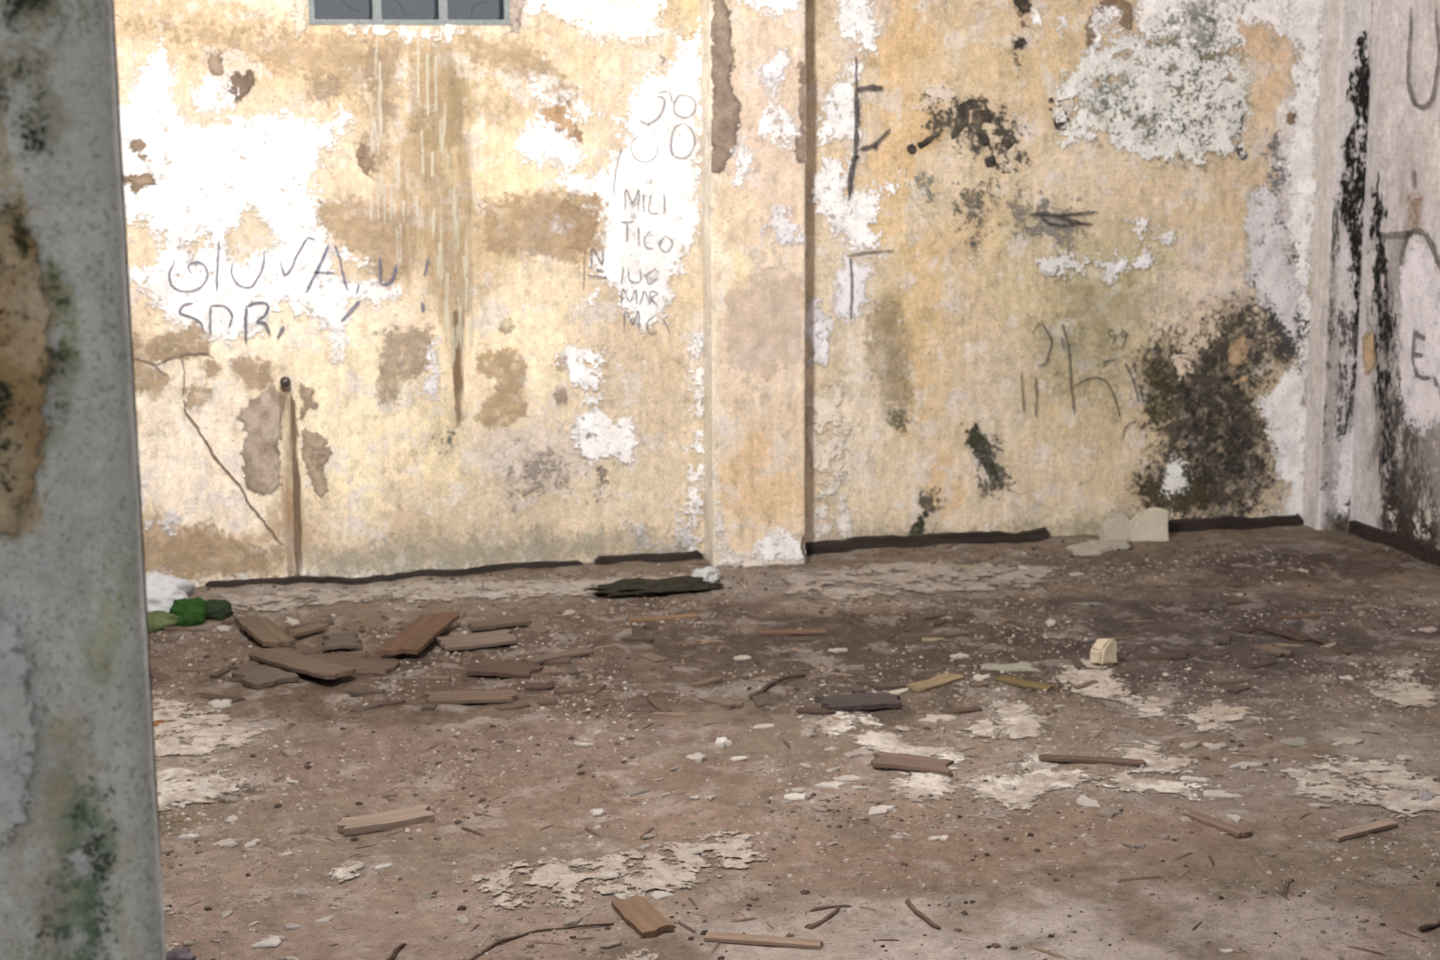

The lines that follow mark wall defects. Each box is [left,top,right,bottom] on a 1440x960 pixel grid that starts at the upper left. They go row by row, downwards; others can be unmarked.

peeling [0,223,53,538]
peeling [120,34,402,364]
peeling [510,0,900,566]
spalling [907,99,1015,167]
leakage [1057,0,1262,173]
peeling [1029,0,1324,518]
leakage [1118,128,1310,520]
leakage [1321,29,1439,549]
peeling [330,567,379,578]
peeling [400,558,480,573]